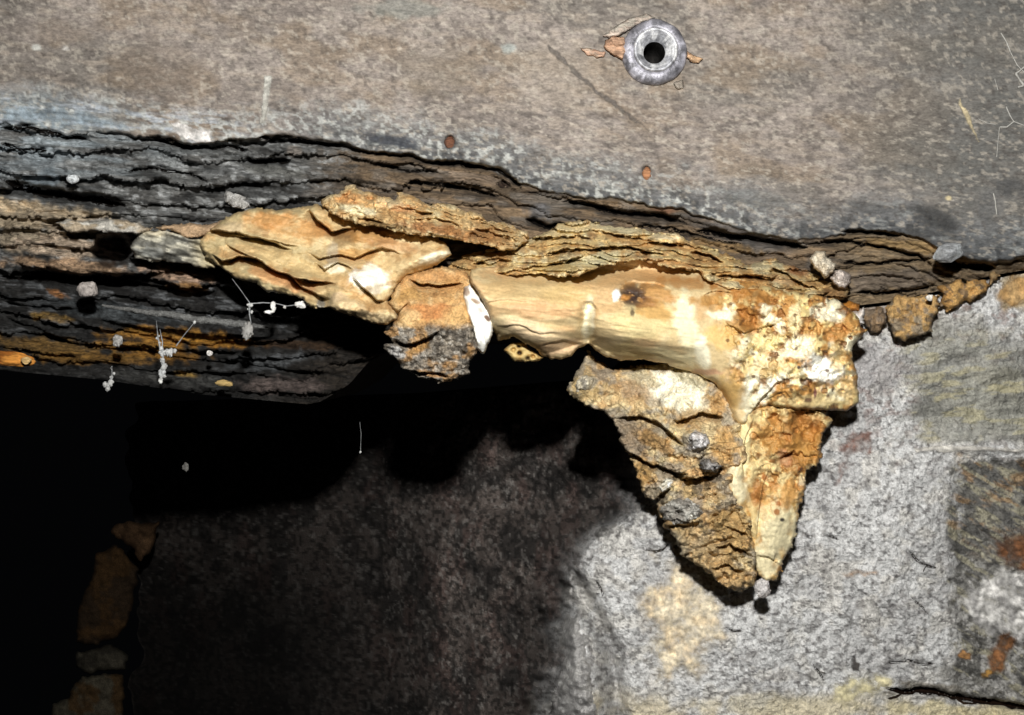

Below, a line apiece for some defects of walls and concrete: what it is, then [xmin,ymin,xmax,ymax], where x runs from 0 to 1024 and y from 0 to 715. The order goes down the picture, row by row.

spalling [933,243,964,263]
corrosion [999,277,1024,306]
corrosion [845,433,871,453]
corrosion [982,633,1015,677]
crack [885,659,1024,710]